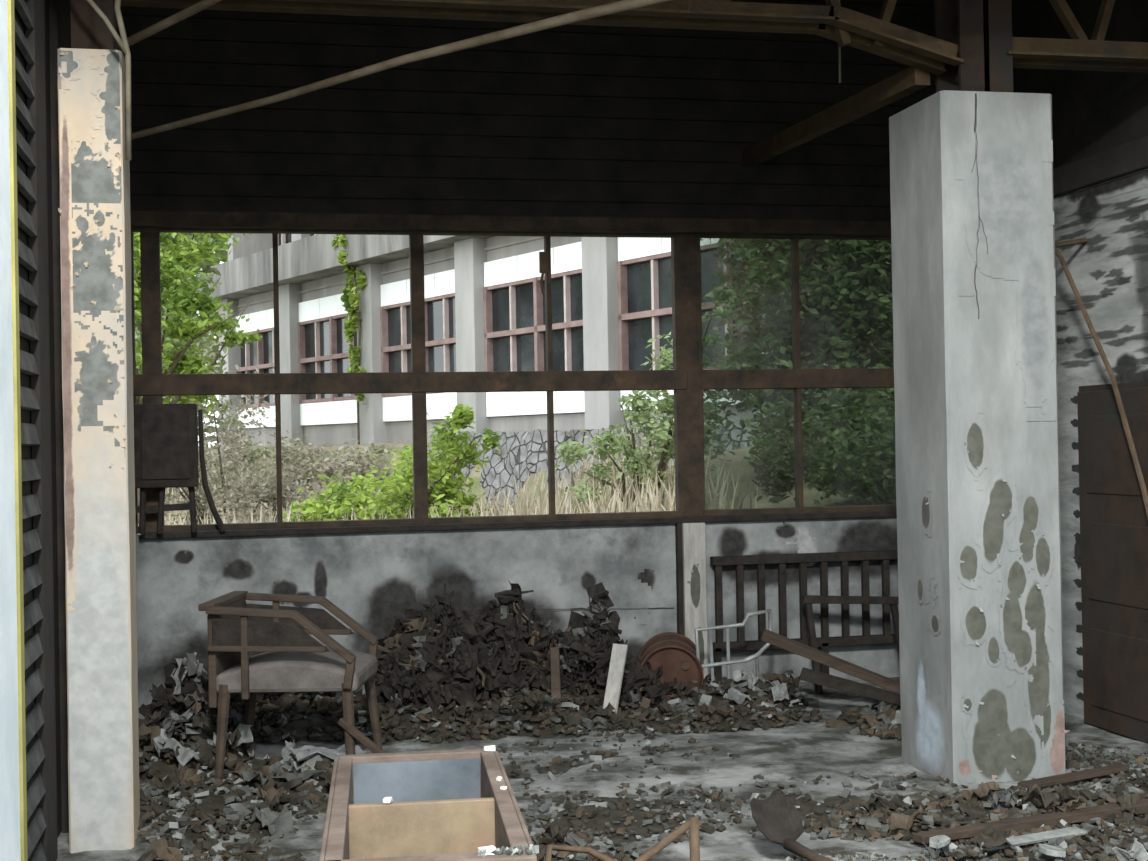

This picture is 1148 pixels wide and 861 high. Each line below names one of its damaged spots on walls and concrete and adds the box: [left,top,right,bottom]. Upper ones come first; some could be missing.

peeling [58,50,126,472]
crack [972,93,988,319]
water stain [955,117,1148,421]
peeling [920,488,932,537]
peeling [957,412,1070,785]